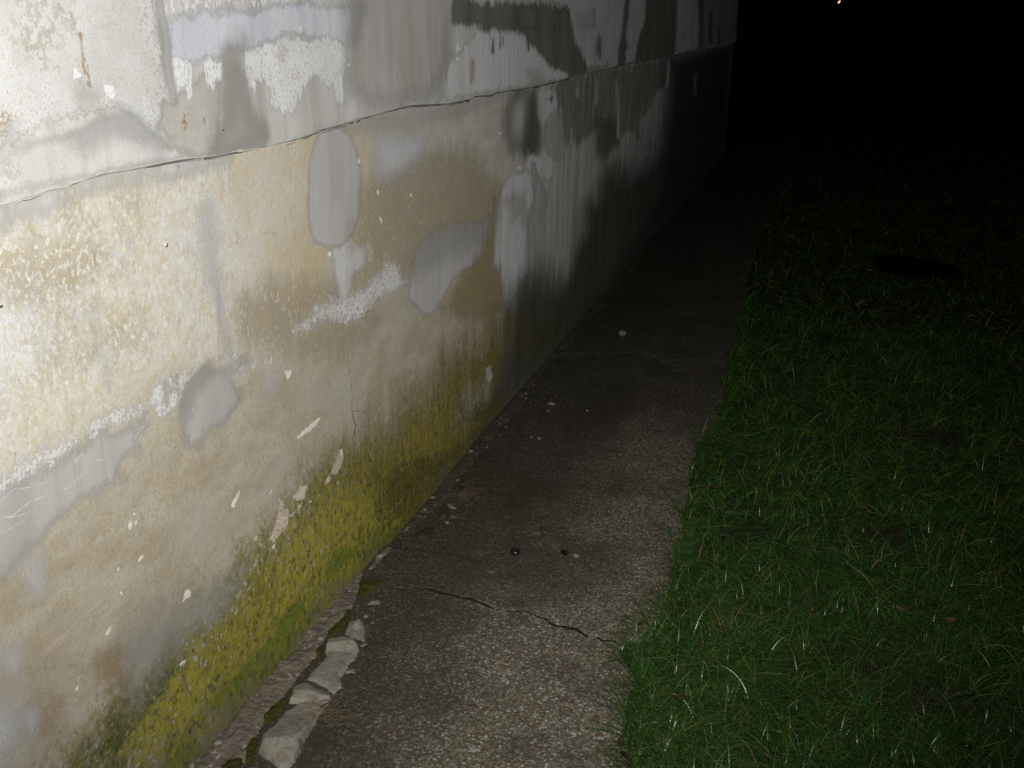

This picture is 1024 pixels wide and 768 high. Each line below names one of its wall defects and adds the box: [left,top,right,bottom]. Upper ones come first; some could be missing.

leakage [157,0,262,157]
crack [1,49,698,206]
spalling [325,449,343,484]
spalling [246,478,312,549]
crack [380,584,616,643]